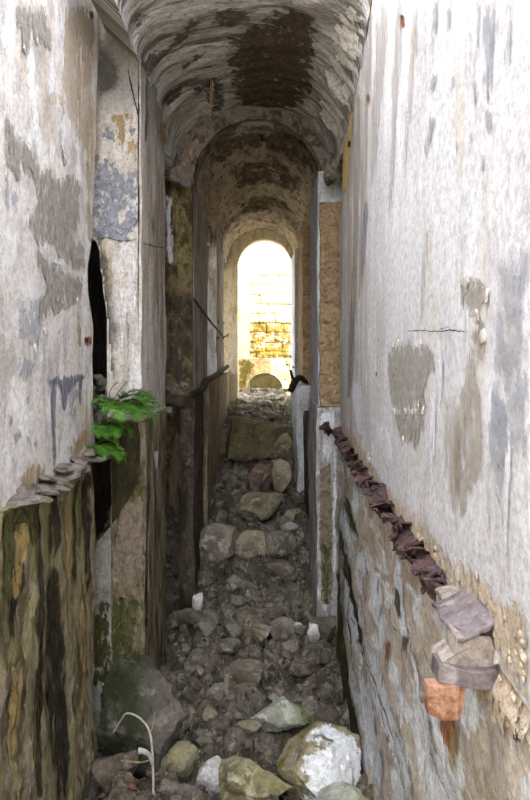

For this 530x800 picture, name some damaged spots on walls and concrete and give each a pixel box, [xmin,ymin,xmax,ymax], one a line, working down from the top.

flaking render [5,118,85,336]
water stain [166,296,188,390]
flaking render [388,339,435,450]
crack [408,325,464,333]
flaking render [459,271,489,344]
water stain [72,472,93,591]
water stain [9,564,25,639]
water stain [35,494,70,799]